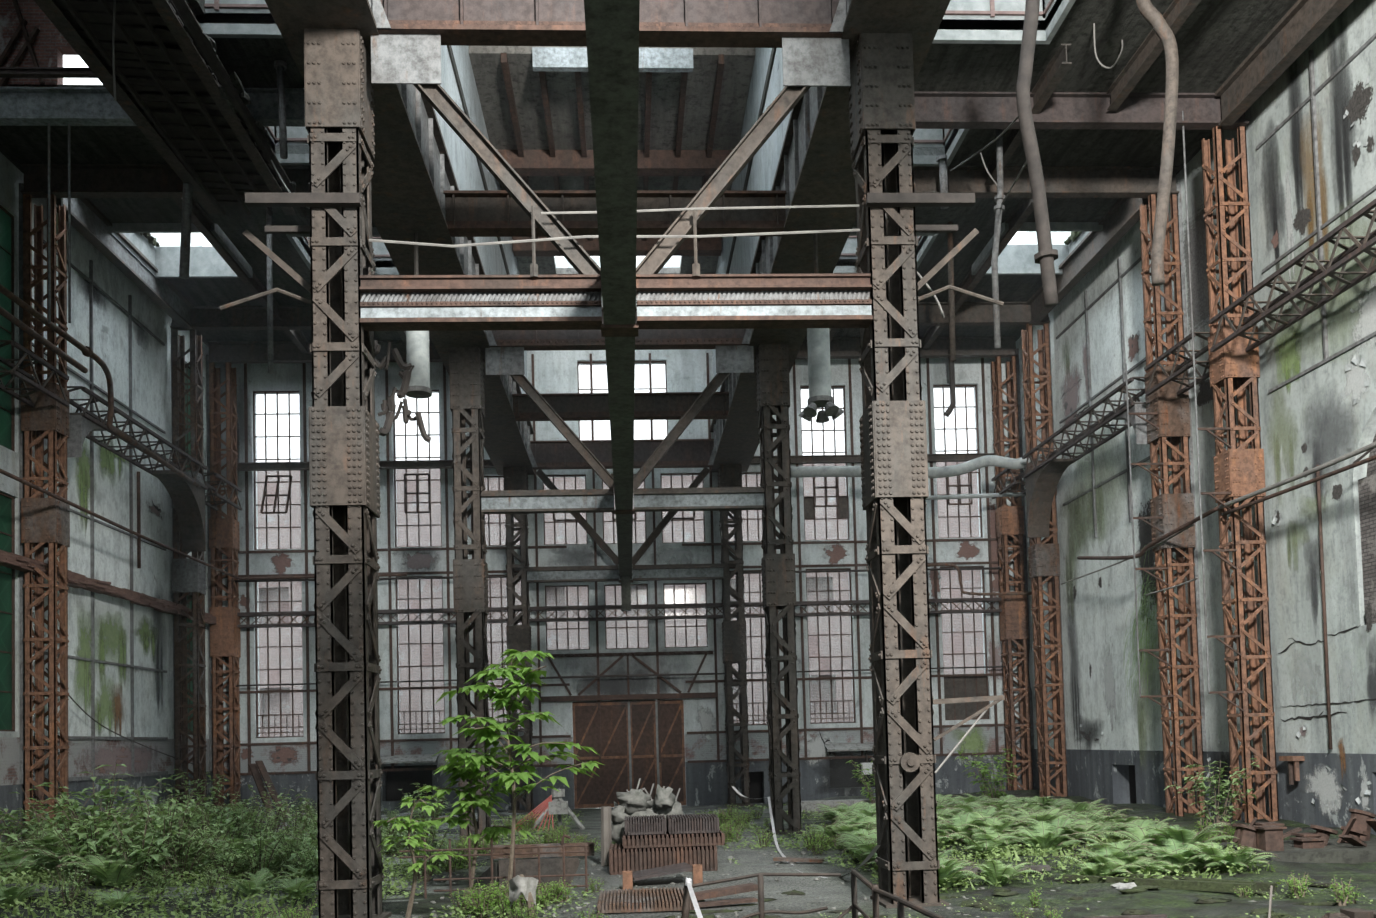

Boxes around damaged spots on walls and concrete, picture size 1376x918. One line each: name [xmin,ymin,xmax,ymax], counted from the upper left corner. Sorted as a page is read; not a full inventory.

leakage [1331,24,1352,223]
leakage [143,611,163,701]
crack [1278,626,1358,654]
spalling [1364,602,1373,632]
leakage [84,632,126,733]
crack [1281,699,1376,722]
peeling [1306,765,1371,816]